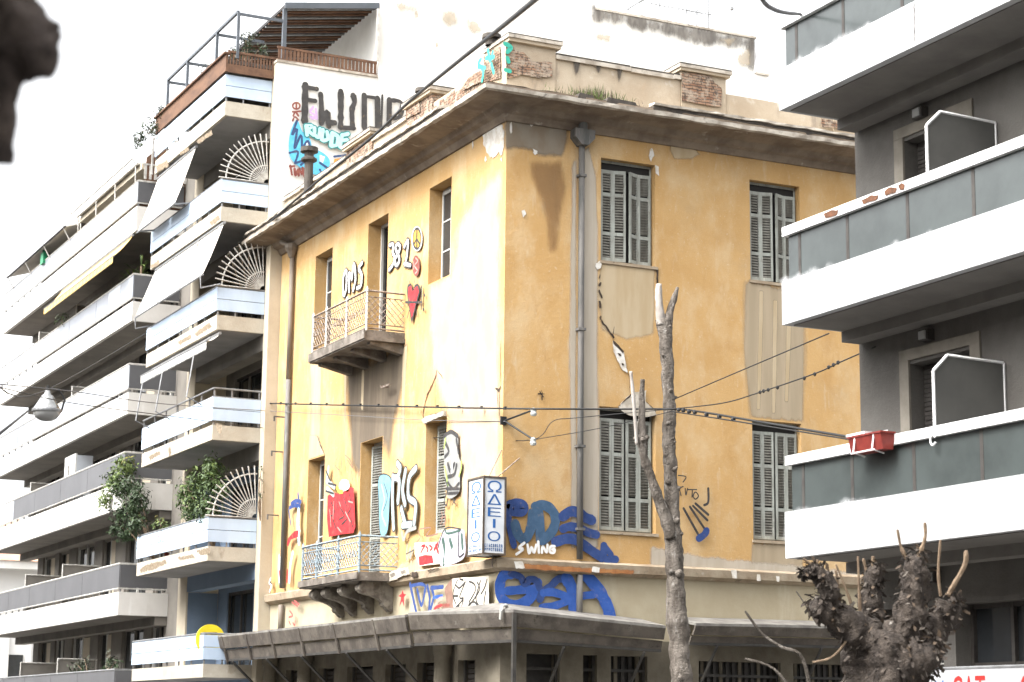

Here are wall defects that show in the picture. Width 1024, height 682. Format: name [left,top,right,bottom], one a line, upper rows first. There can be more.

damp [592,5,757,68]
flaking render [461,43,553,91]
flaking render [681,73,722,107]
flaking render [472,121,567,162]
damp [533,148,600,548]